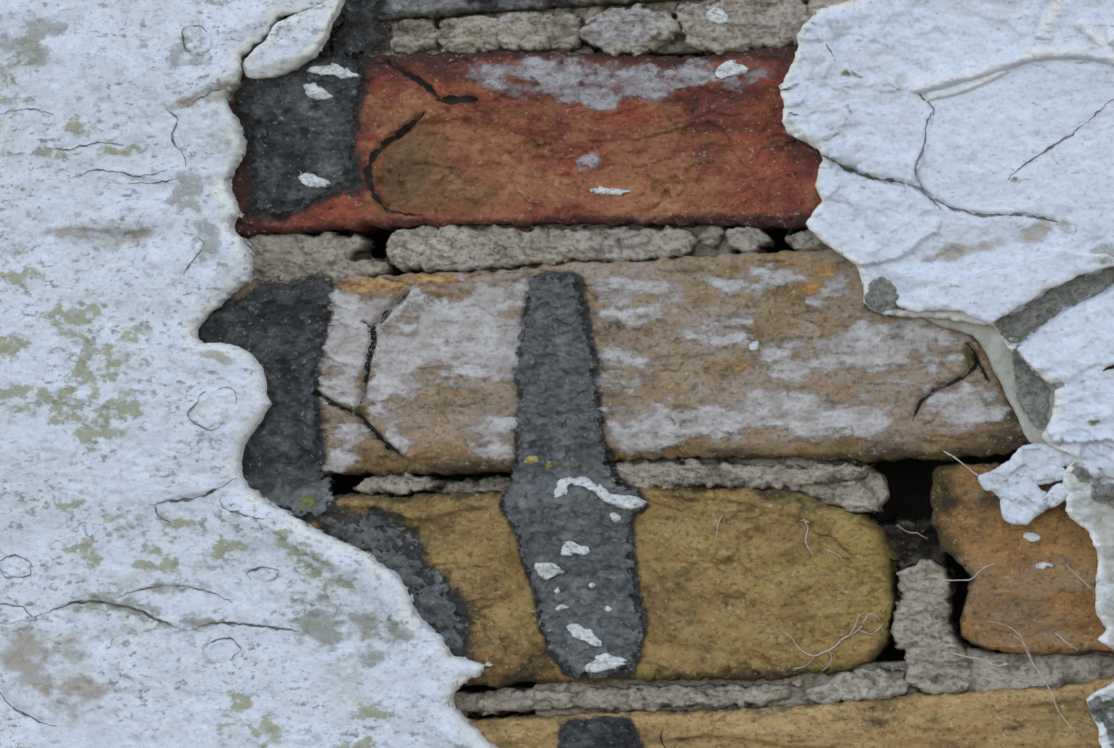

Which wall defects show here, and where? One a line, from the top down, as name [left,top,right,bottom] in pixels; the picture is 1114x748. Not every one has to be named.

peeling [590,186,631,196]
crack [803,112,1058,222]
crack [1008,99,1114,180]
peeling [779,0,1114,650]
peeling [0,0,498,748]
crack [312,290,410,455]
crack [912,342,990,421]
crack [34,585,298,632]
crack [0,692,57,727]
peeling [1086,680,1114,748]